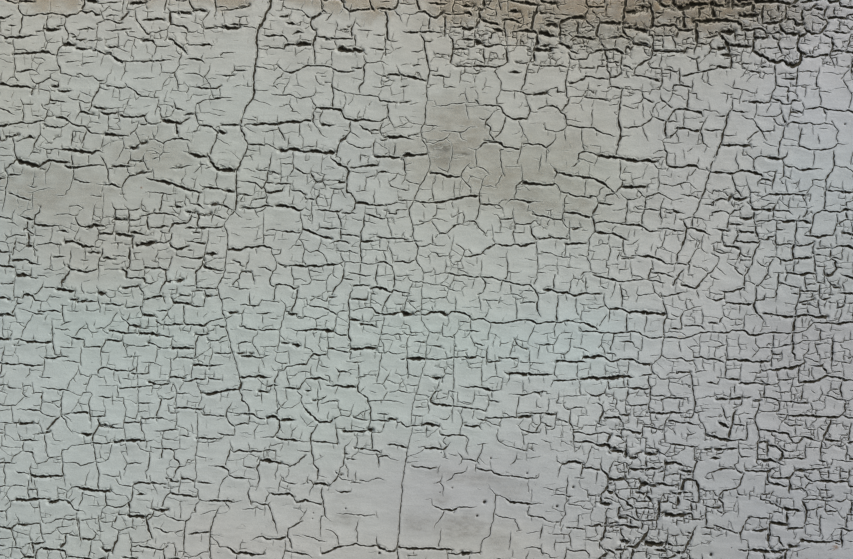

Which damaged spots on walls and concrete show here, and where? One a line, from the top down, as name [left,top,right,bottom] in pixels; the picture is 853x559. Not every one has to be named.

crack [336,0,375,20]
crack [186,51,235,64]
crack [821,331,853,368]
crack [43,392,73,434]
crack [438,411,470,456]
crack [585,402,606,432]
crack [596,414,625,428]
crack [661,433,699,452]
crack [474,460,540,501]
crack [425,498,476,529]
crack [770,512,790,530]
crack [553,531,595,559]